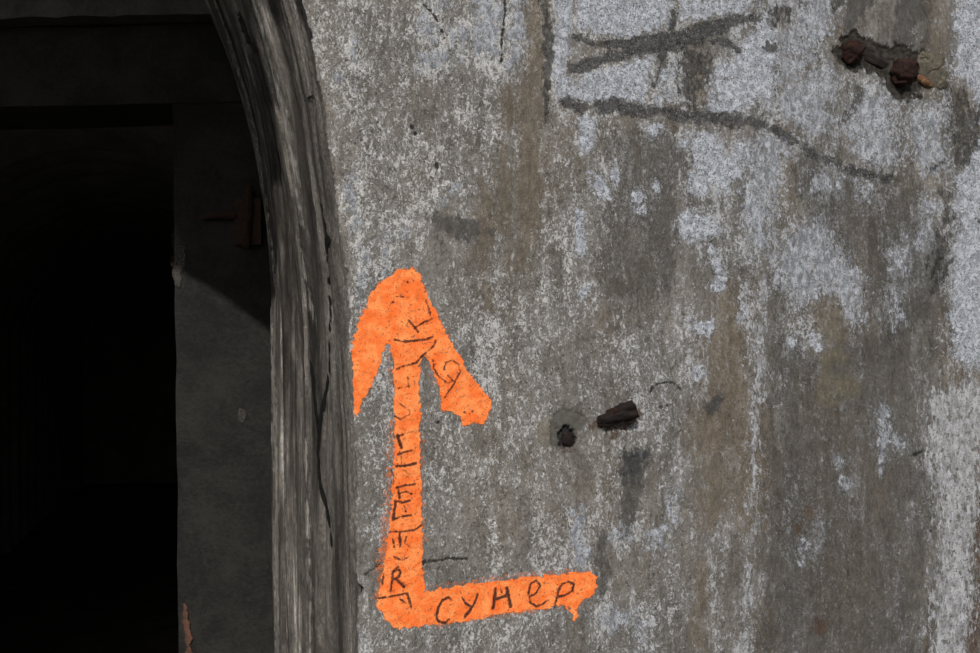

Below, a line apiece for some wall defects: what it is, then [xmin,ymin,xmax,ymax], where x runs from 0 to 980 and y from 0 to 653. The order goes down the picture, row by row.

water stain [926,88,980,171]
water stain [925,188,956,299]
crack [310,202,333,547]
water stain [595,533,611,594]
corrosion [588,408,642,439]
water stain [731,270,776,653]
water stain [915,375,980,653]